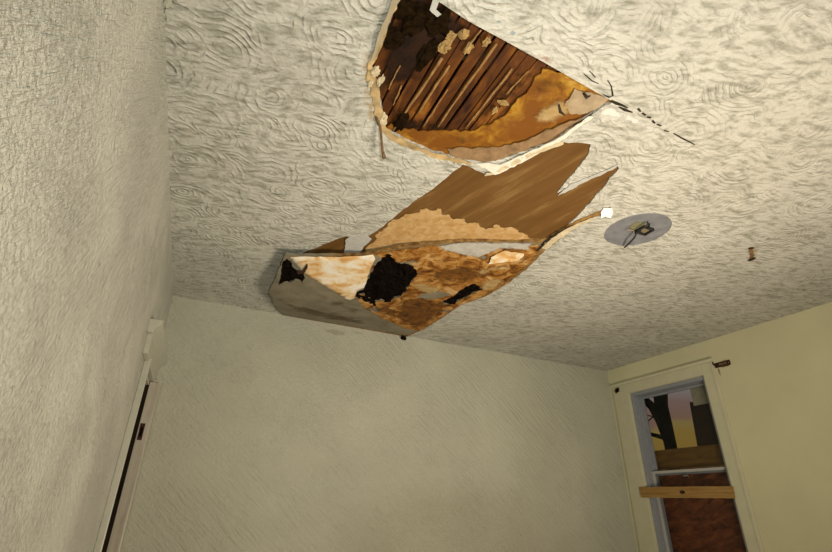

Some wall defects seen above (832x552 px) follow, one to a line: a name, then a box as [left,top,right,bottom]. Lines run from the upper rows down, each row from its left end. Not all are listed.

peeling [370,0,400,63]
crack [584,71,695,145]
peeling [302,131,618,254]
leakage [357,244,541,331]